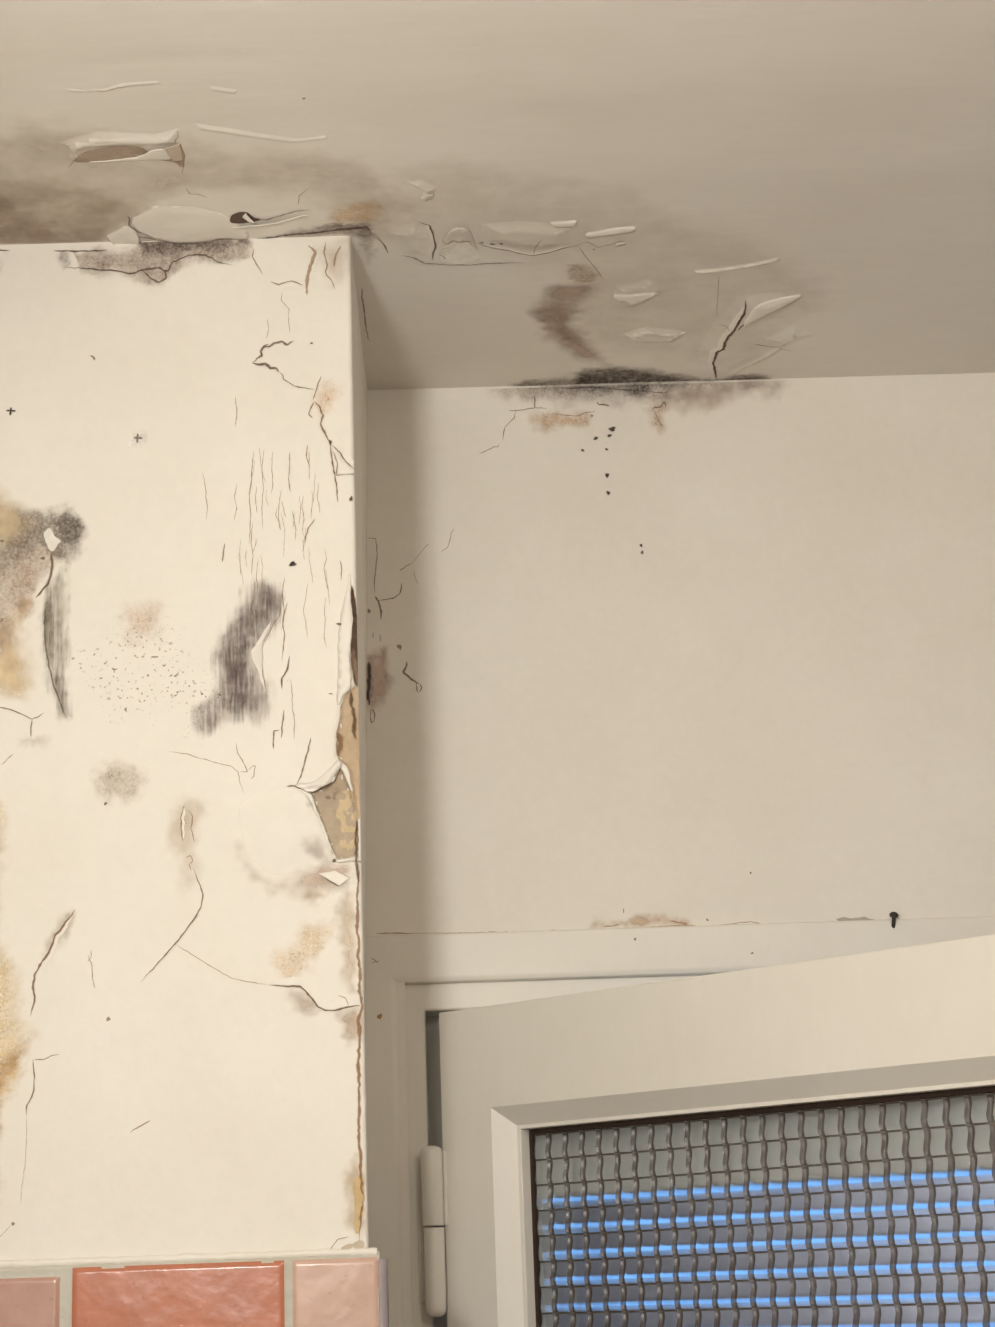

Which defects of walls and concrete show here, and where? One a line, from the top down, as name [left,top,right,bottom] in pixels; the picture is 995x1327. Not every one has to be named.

peeling [59,128,185,172]
peeling [107,206,307,247]
peeling [550,220,636,250]
water stain [521,329,687,393]
crack [698,281,817,380]
crack [203,190,601,692]
water stain [0,515,80,714]
water stain [201,643,246,726]
flaking render [288,573,361,882]
crack [31,909,95,1018]
crack [145,870,514,1249]
crack [22,1054,58,1184]